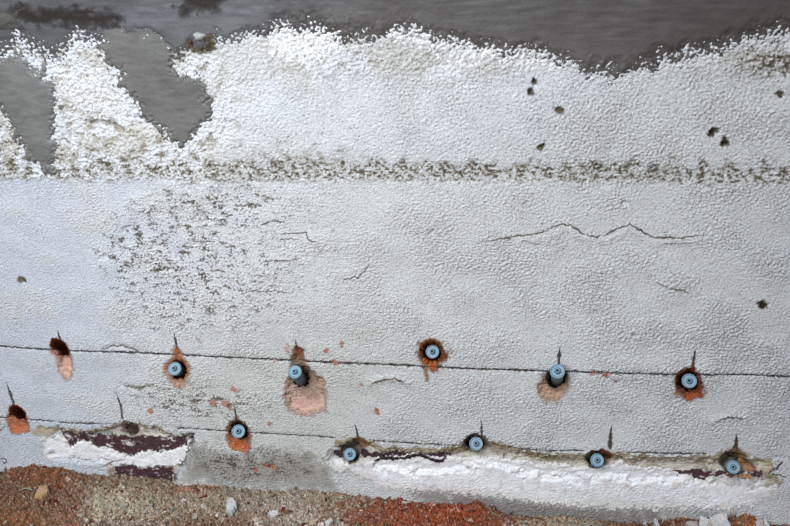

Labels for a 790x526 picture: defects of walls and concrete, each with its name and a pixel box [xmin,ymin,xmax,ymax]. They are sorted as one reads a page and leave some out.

water stain [11,2,121,28]
water stain [172,0,222,16]
hole [186,32,215,54]
crack [483,223,714,245]
rust [286,346,306,361]
rust [416,338,448,381]
flaking render [6,407,193,483]